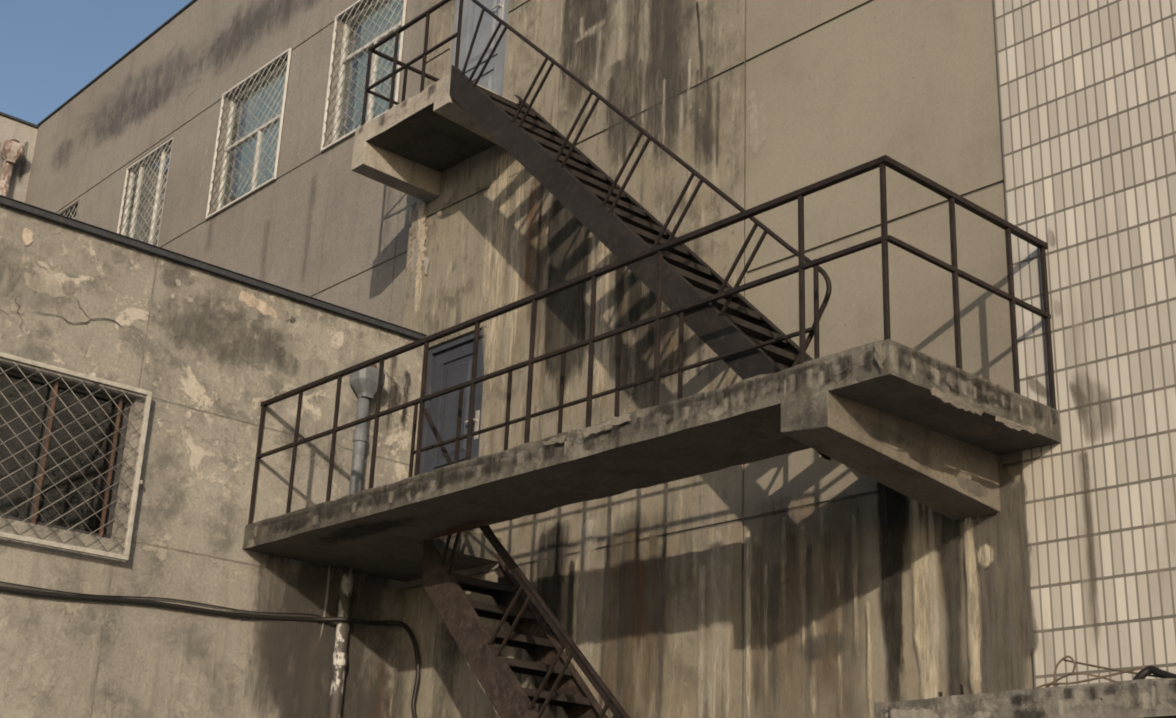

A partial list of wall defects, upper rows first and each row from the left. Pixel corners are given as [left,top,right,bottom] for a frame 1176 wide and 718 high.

water stain [562,0,719,165]
crack [0,298,141,330]
water stain [255,554,402,718]
water stain [520,521,594,663]
water stain [699,533,729,718]
water stain [746,532,768,712]
water stain [800,525,816,716]
water stain [820,482,993,718]
peeling [885,708,939,718]
water stain [1012,695,1045,718]
water stain [1085,487,1095,586]